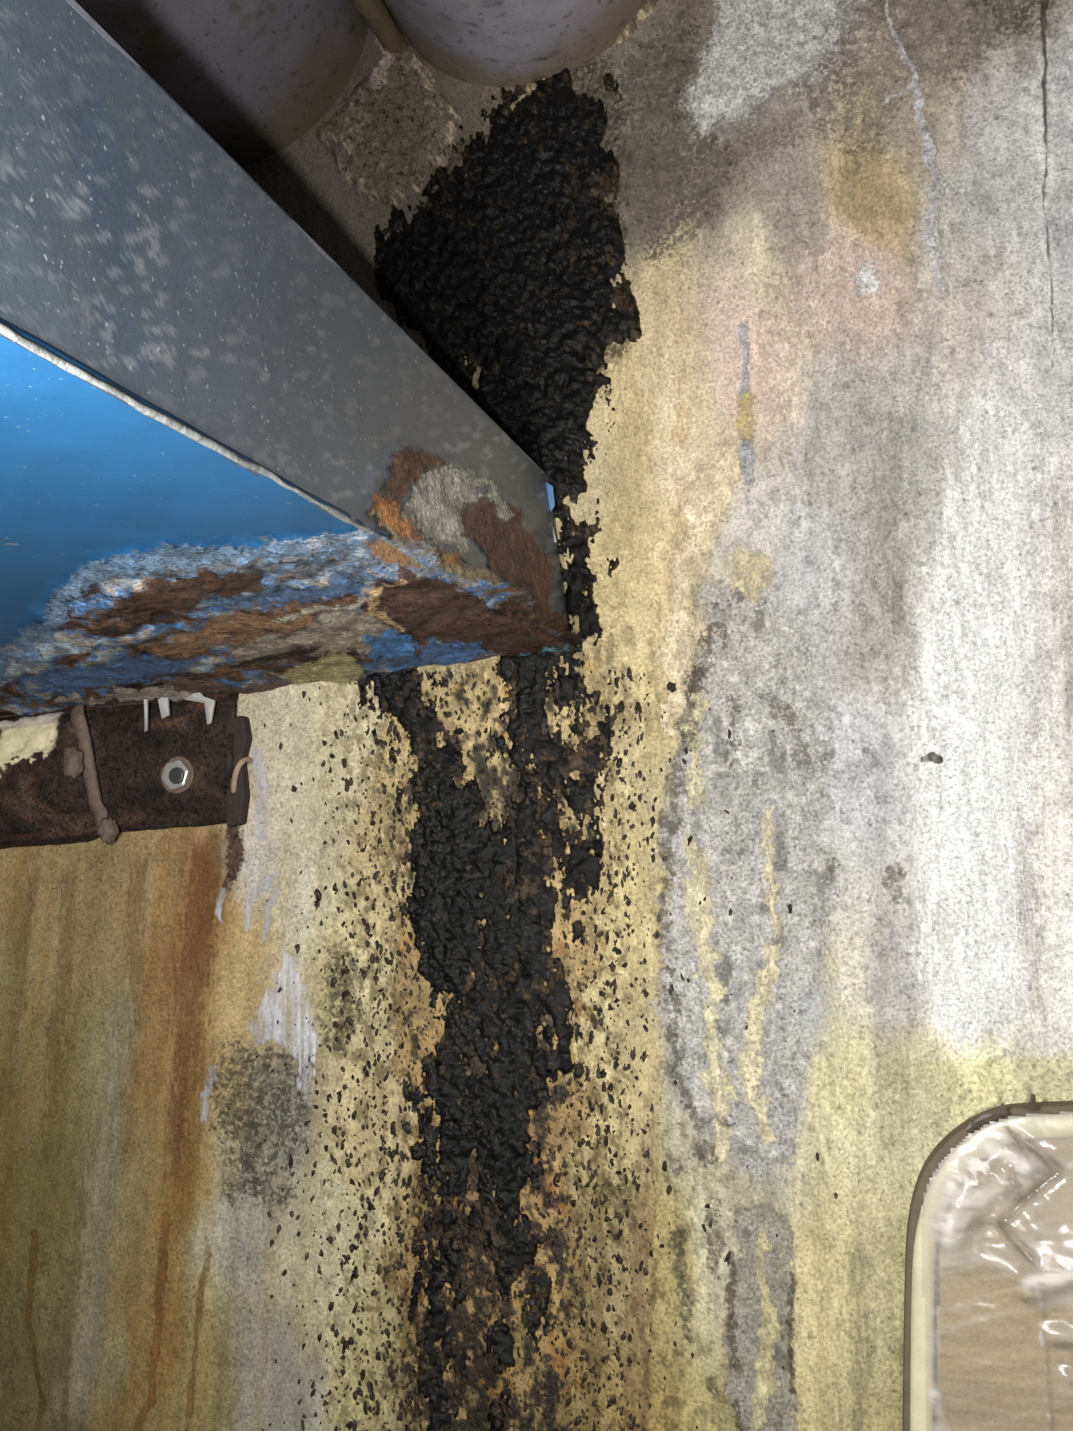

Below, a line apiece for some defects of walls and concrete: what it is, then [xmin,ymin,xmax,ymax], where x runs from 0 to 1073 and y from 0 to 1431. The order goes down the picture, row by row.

crack [1040,0,1053,331]
rust [89,448,573,708]
damp [200,0,1055,1431]
rust [167,827,244,1191]
rust [134,1212,170,1431]
rust [187,1256,210,1427]